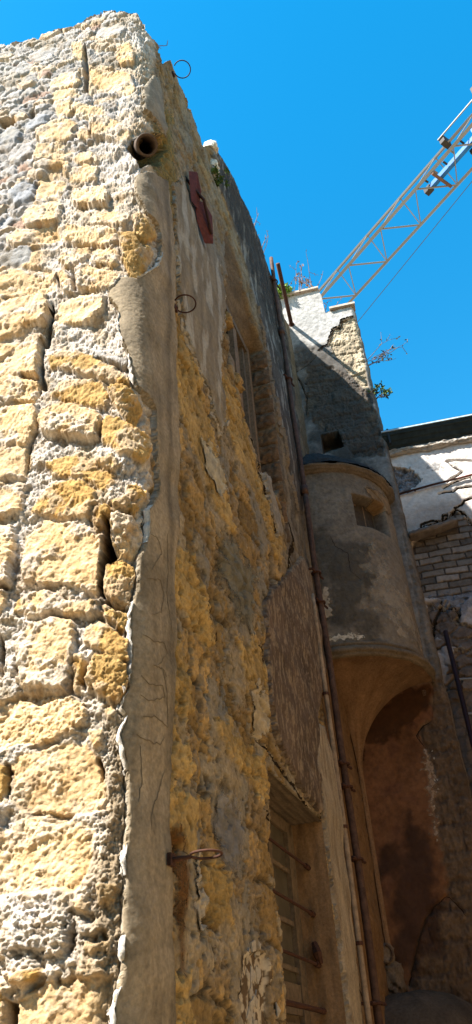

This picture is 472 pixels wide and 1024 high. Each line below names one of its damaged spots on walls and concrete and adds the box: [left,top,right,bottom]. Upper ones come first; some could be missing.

crack [420,461,472,528]
crack [138,534,173,824]
water stain [354,686,432,763]
water stain [374,749,441,974]
flaking render [238,940,281,1024]